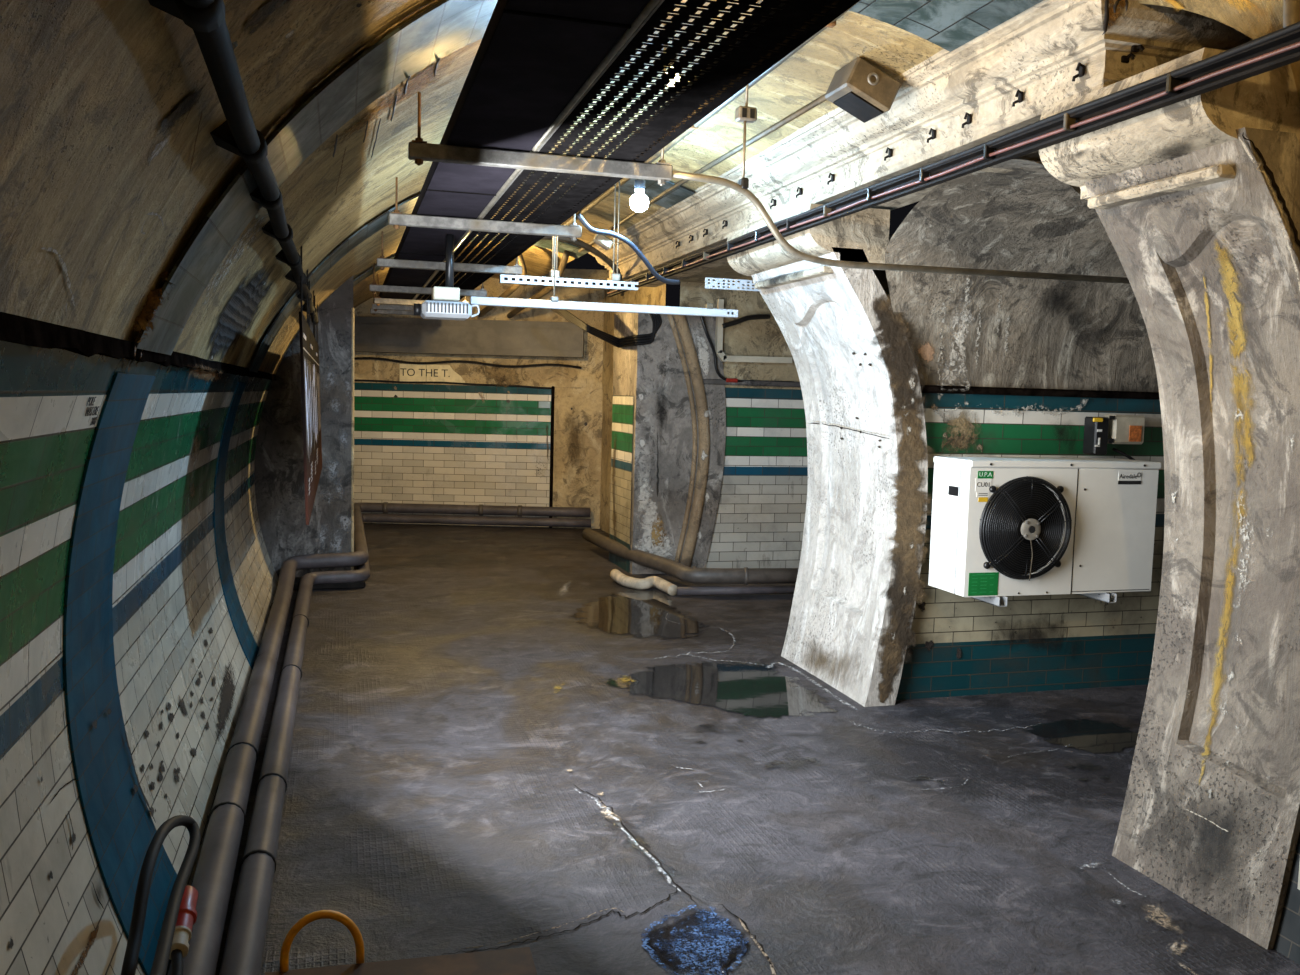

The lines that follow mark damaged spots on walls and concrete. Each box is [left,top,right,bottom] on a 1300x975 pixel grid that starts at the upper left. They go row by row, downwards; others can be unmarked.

spalling [125,658,216,823]
crack [444,769,777,975]